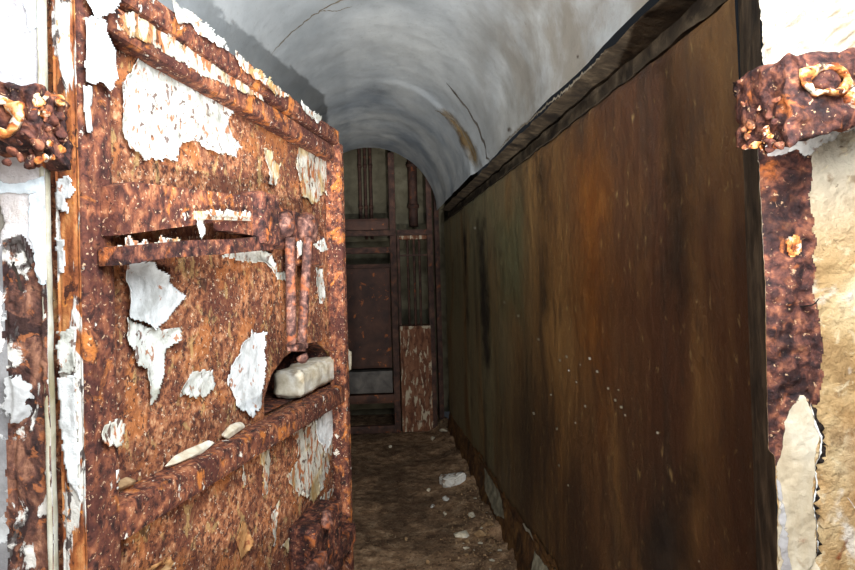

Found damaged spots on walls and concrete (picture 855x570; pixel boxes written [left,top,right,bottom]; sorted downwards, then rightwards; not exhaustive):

crack [274,0,352,51]
peeling [83,0,291,162]
crack [447,52,606,163]
peeling [296,145,327,204]
peeling [194,209,252,239]
flaking render [0,175,81,570]
peeling [126,261,186,405]
peeling [180,369,216,399]
peeling [227,330,268,418]
flaking render [758,127,855,570]
peeling [102,418,125,447]
peeling [287,410,334,504]